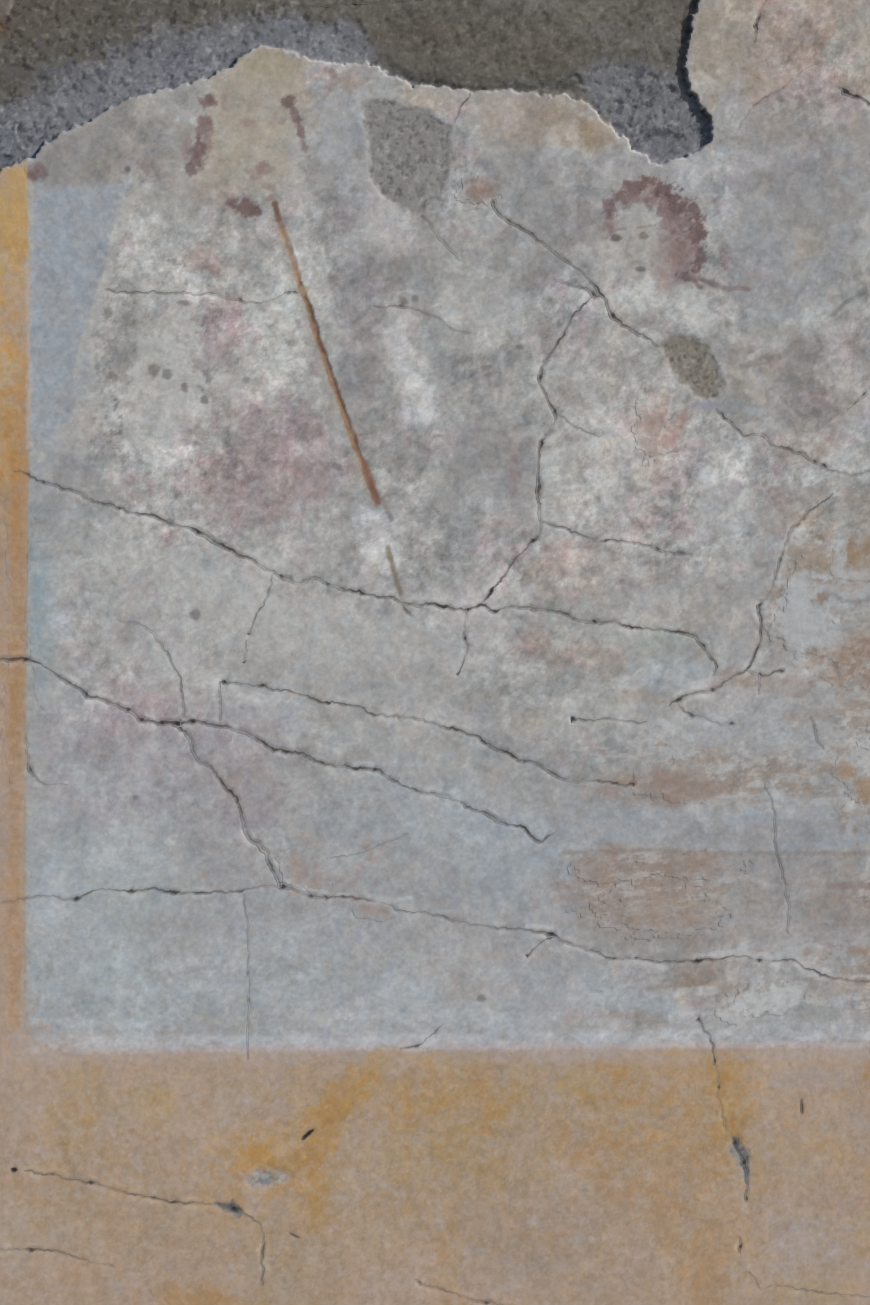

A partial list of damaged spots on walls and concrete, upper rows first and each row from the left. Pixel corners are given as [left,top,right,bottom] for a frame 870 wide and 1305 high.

flaking render [0,0,713,172]
spalling [363,101,505,215]
crack [0,198,870,1060]
crack [697,1017,750,1203]
crack [0,1247,116,1268]
crack [25,1169,266,1286]
crack [738,1236,870,1298]